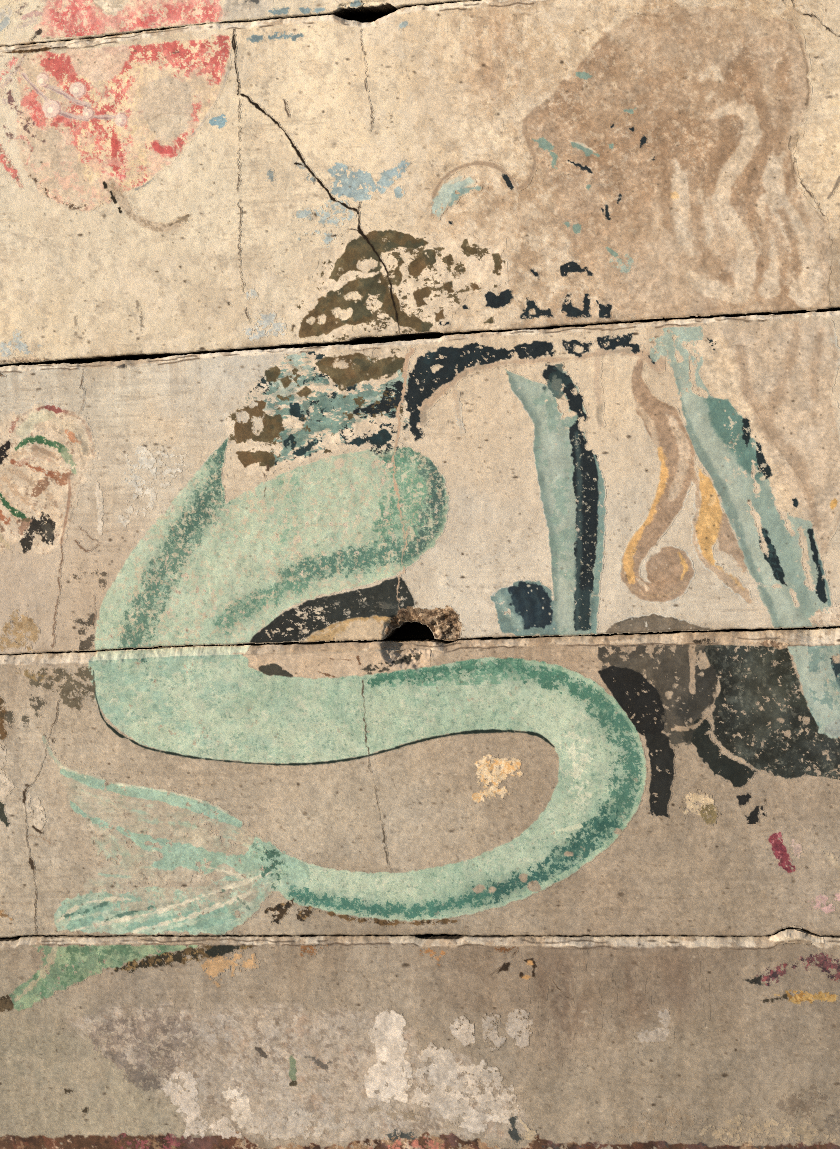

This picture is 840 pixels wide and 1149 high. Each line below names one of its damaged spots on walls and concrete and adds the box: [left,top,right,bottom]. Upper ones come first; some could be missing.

crack [781,0,840,38]
crack [787,135,826,217]
crack [231,28,416,609]
spalling [384,605,463,645]